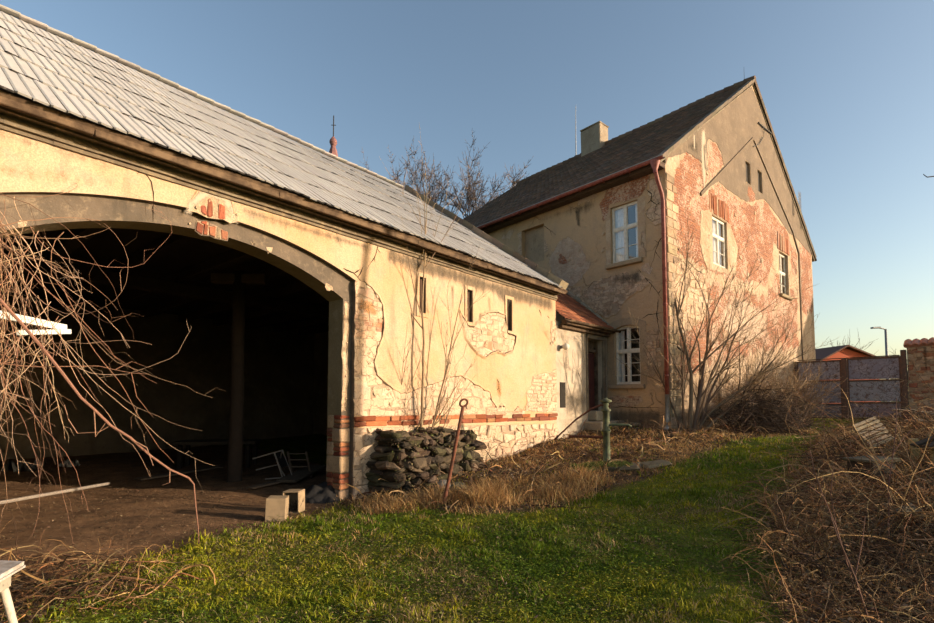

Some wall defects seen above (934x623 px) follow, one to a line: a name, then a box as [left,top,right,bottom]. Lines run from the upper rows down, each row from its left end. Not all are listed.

spalling [189,190,239,241]
flaking render [577,174,650,221]
flaking render [549,237,653,319]
flaking render [669,140,813,380]
flaking render [341,278,573,499]